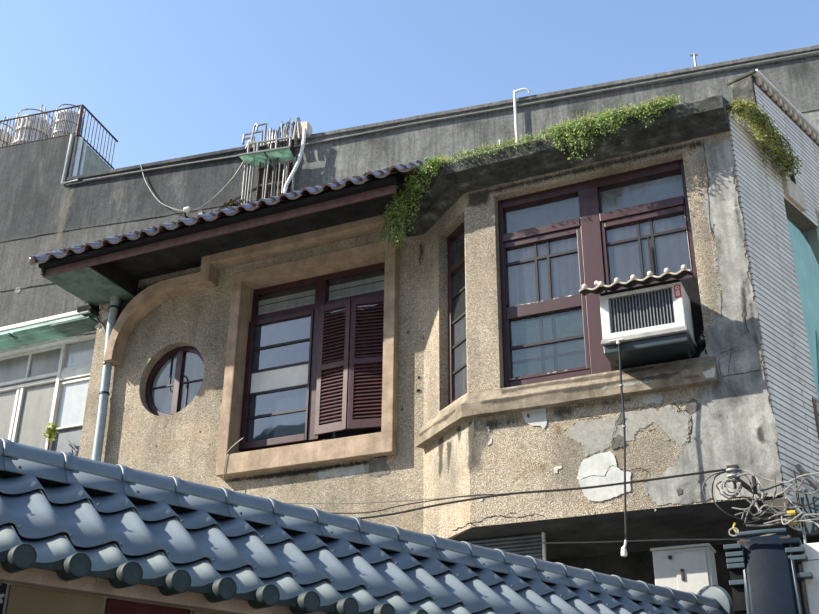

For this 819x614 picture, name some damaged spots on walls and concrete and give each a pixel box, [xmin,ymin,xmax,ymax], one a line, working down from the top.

crack [703,143,714,240]
peeling [564,137,783,511]
crack [718,349,764,377]
leakage [438,421,474,474]